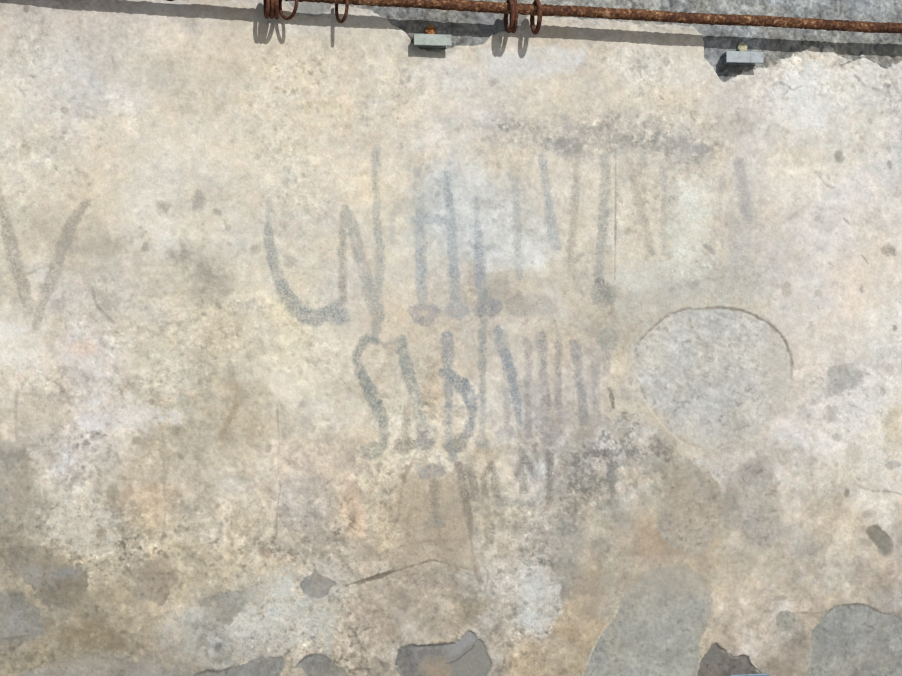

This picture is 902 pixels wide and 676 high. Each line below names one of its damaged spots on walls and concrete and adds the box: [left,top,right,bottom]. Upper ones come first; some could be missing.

flaking render [324,0,902,82]
crack [335,558,489,596]
spalling [395,630,492,676]
spalling [697,642,764,676]
spalling [804,602,902,676]